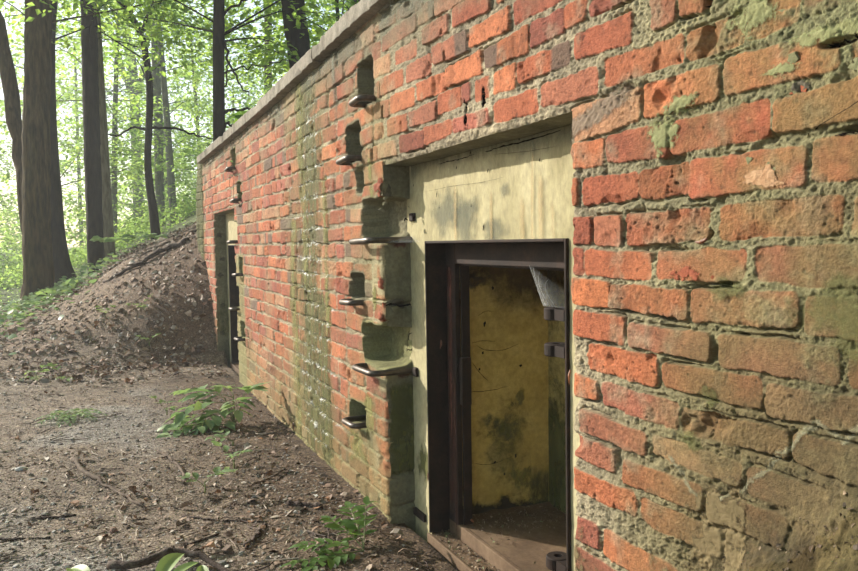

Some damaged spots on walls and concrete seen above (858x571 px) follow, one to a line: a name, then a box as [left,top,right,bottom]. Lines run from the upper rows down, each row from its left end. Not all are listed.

crack [808,101,858,136]
crack [441,130,560,164]
leakage [436,196,475,238]
leakage [290,36,354,466]
leakage [469,266,565,311]
leakage [472,472,549,514]